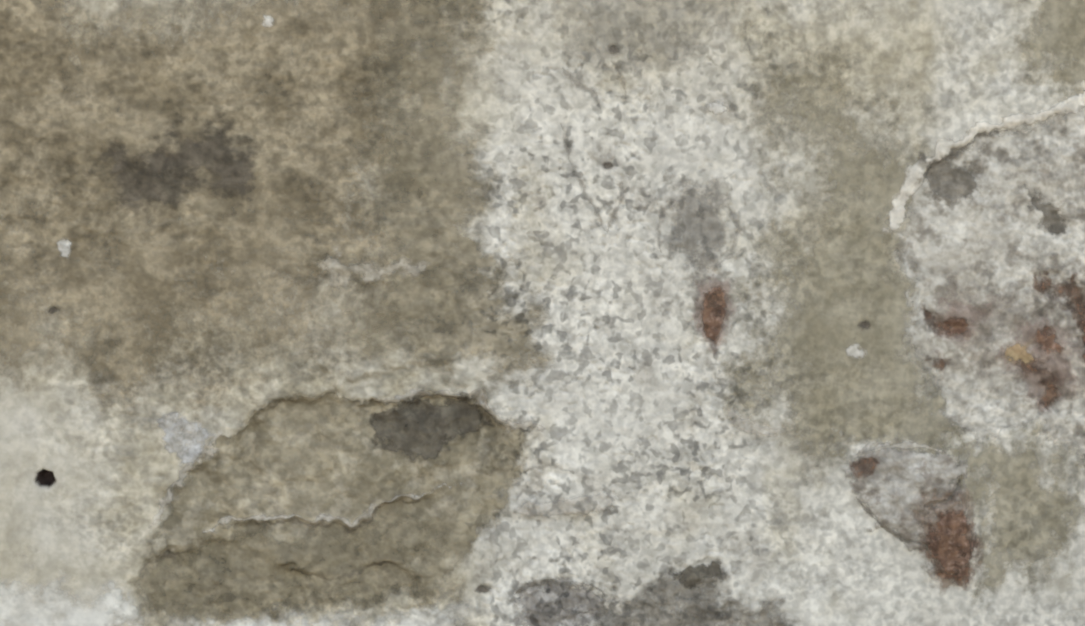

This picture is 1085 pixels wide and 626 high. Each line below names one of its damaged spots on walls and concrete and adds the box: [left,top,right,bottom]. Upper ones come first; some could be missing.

water stain [0,0,549,401]
rust [702,286,726,343]
water stain [724,55,1085,596]
rust [924,309,968,336]
spalling [883,91,1085,459]
rust [1005,326,1064,408]
rust [1034,272,1085,359]
spalling [0,388,615,626]